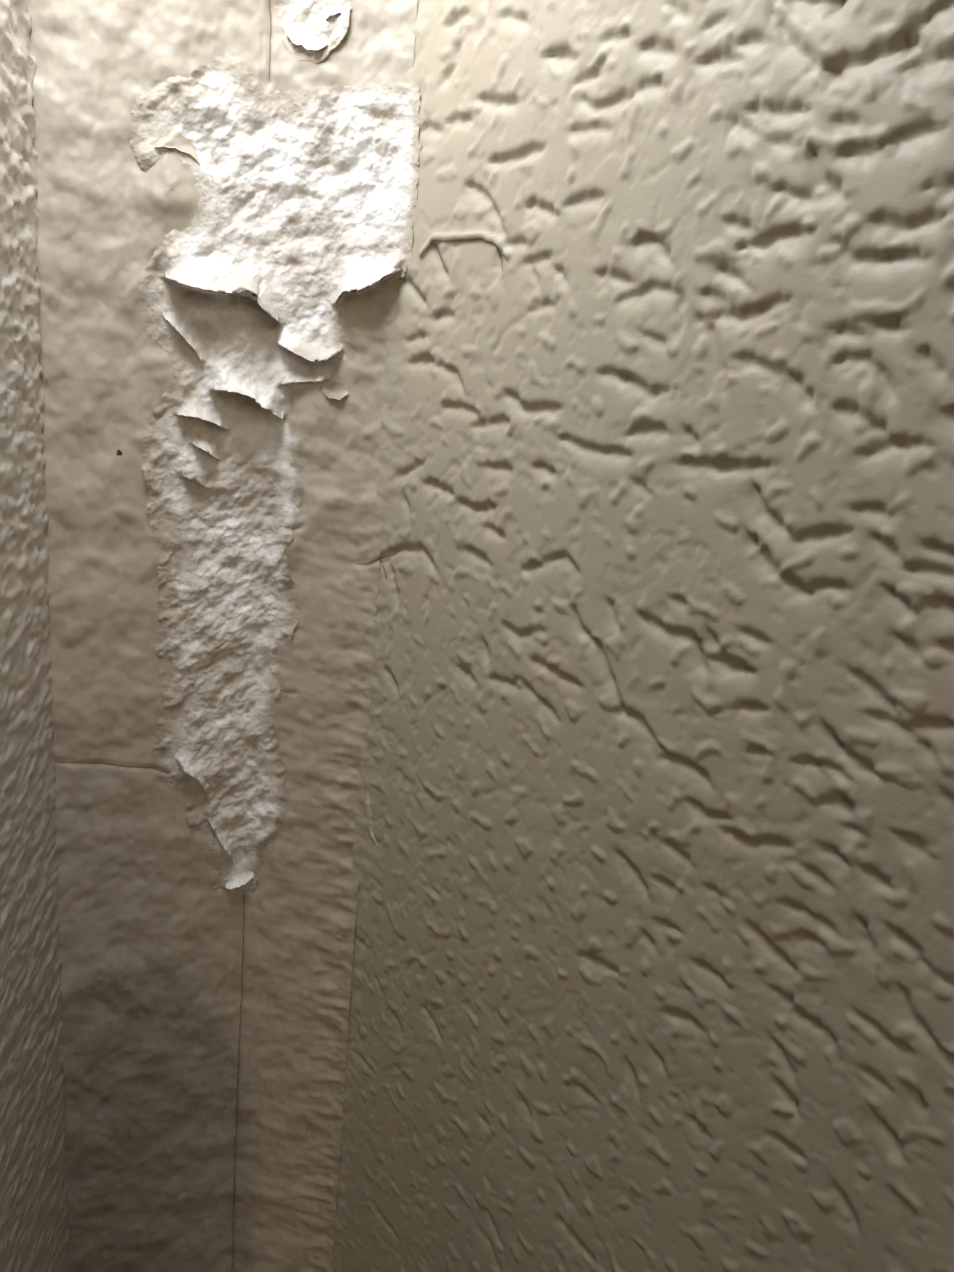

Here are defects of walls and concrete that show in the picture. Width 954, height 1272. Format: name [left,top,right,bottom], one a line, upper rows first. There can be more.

spalling [274,0,352,63]
spalling [130,52,421,896]